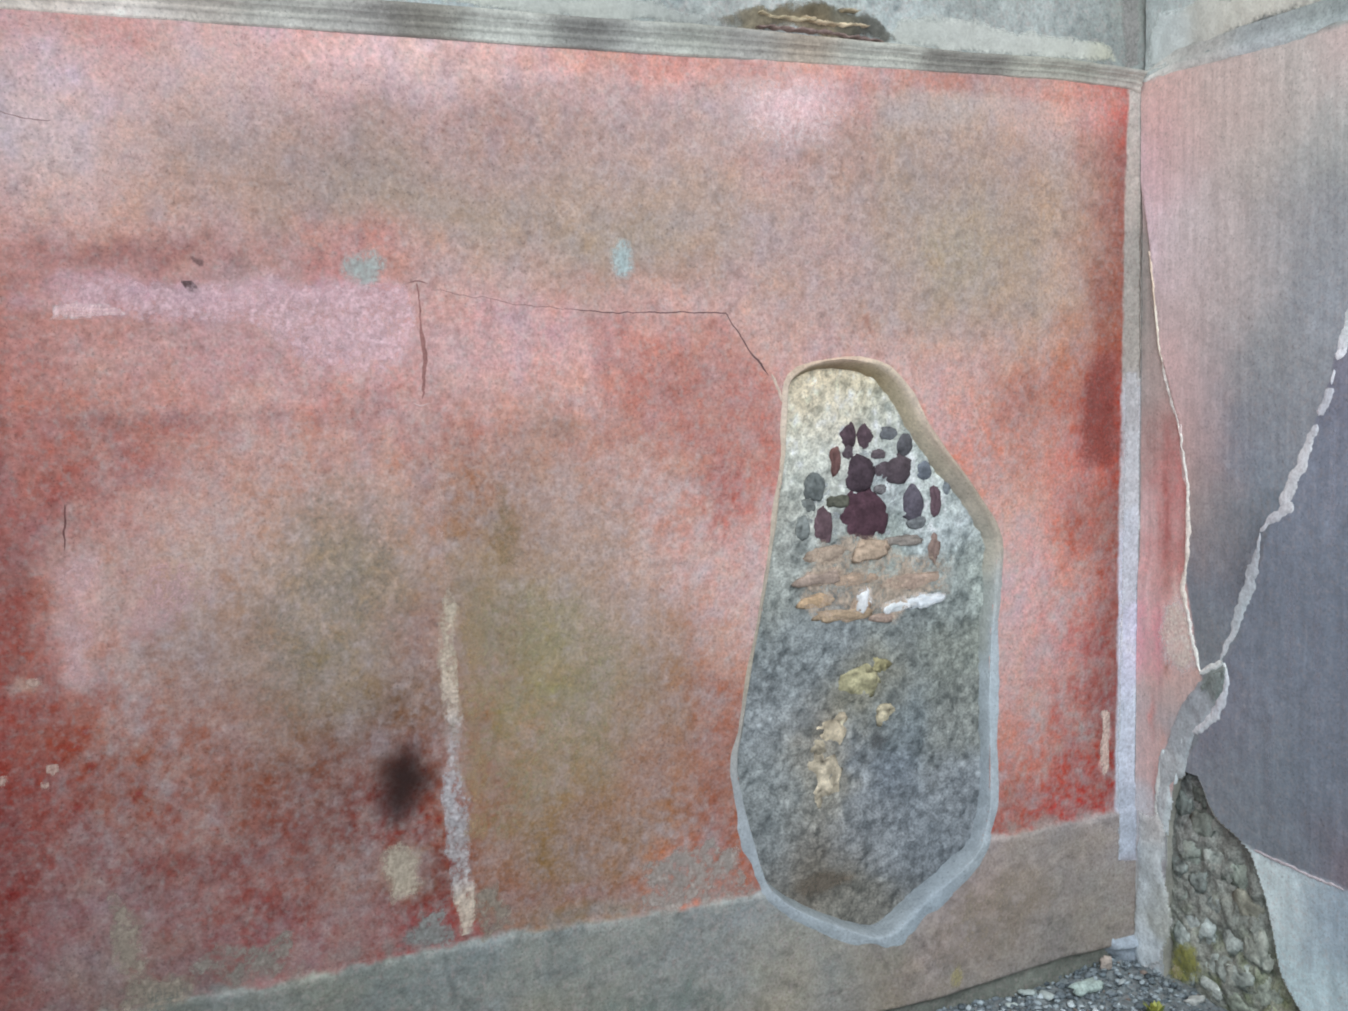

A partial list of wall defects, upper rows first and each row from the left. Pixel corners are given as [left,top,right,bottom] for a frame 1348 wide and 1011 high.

crack [408,280,784,407]
crack [1139,185,1348,672]
damp [386,753,426,814]
peeling [406,598,511,946]
flaking render [642,356,1004,948]
peeling [111,907,292,1010]